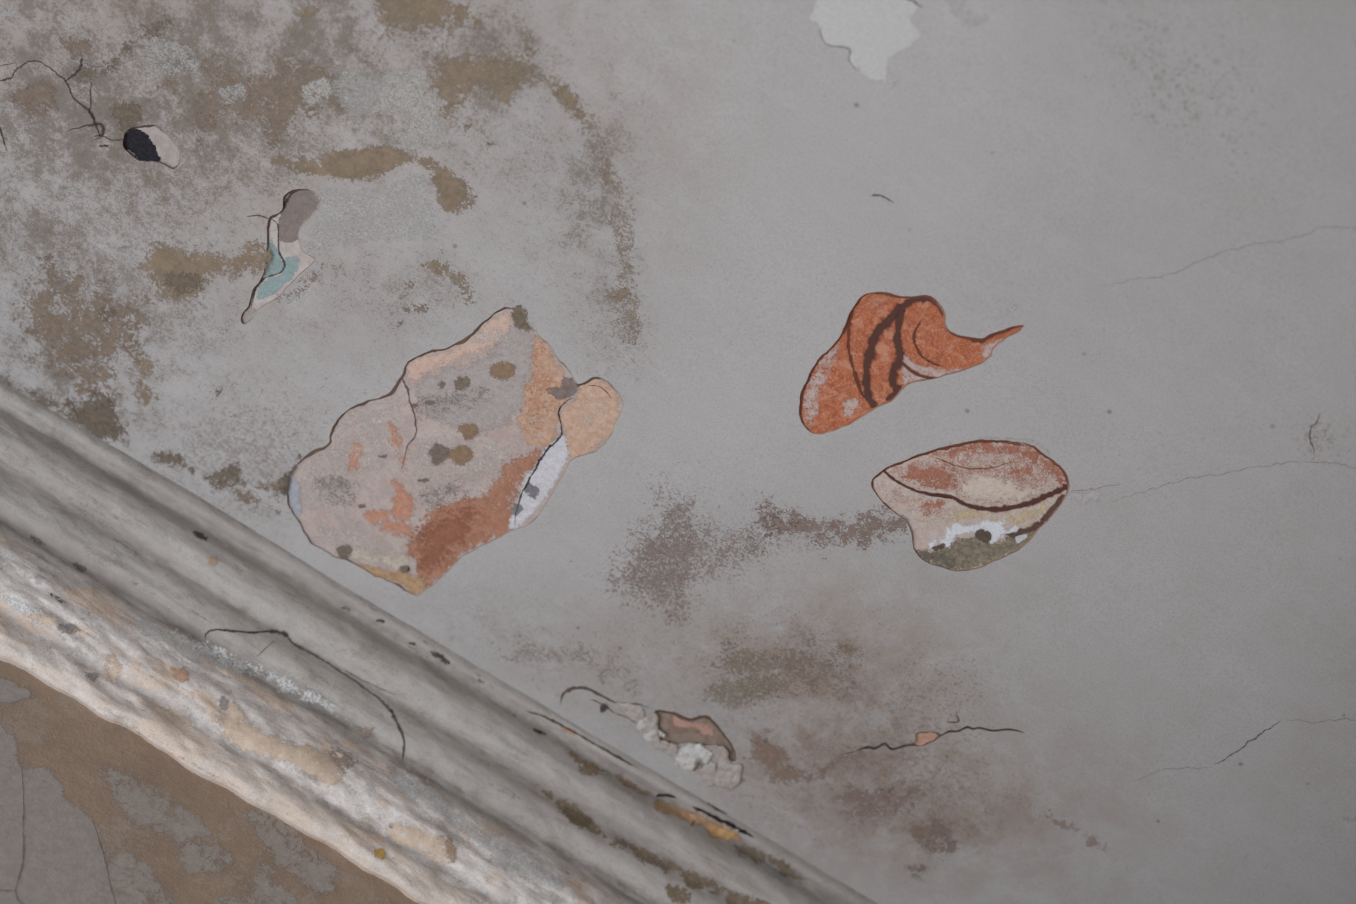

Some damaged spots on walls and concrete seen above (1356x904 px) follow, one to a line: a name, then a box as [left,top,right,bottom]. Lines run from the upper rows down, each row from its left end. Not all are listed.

crack [0,58,124,147]
spalling [123,125,182,169]
damp [156,51,478,215]
damp [363,0,644,359]
damp [1,235,273,448]
spalling [799,292,1024,434]
spalling [278,305,624,596]
damp [572,462,914,633]
spalling [871,436,1070,571]
crack [205,629,405,763]
crack [847,711,1024,754]
crack [1218,721,1280,764]